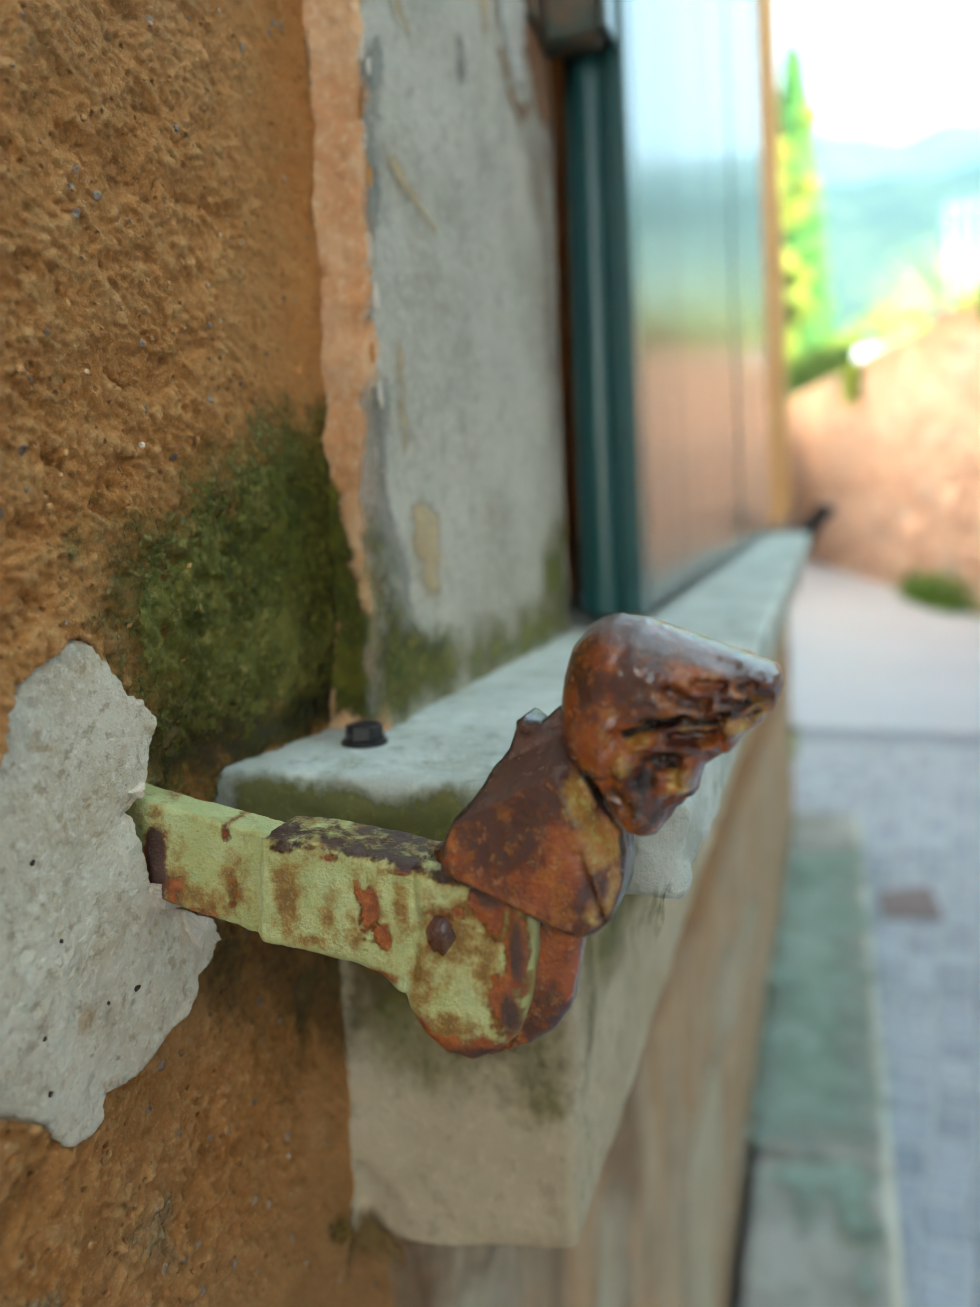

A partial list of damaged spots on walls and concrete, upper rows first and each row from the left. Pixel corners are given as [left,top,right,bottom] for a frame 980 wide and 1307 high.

spalling [0,639,222,1147]